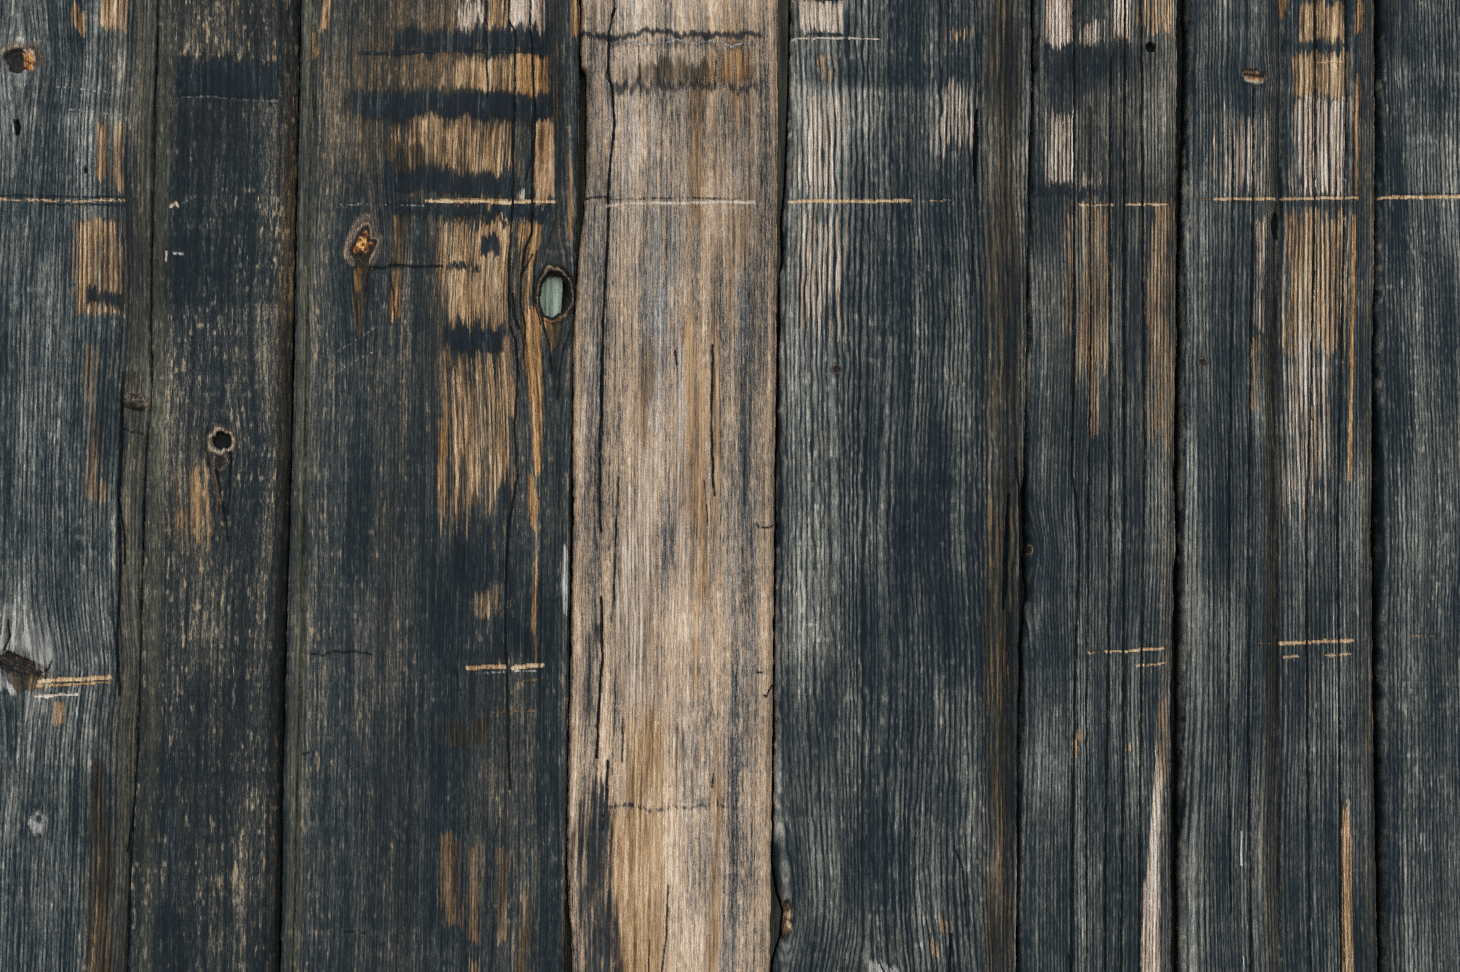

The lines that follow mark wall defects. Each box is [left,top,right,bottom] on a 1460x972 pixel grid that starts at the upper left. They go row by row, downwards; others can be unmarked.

crack [485,0,645,972]
crack [674,344,715,530]
crack [1002,458,1020,665]